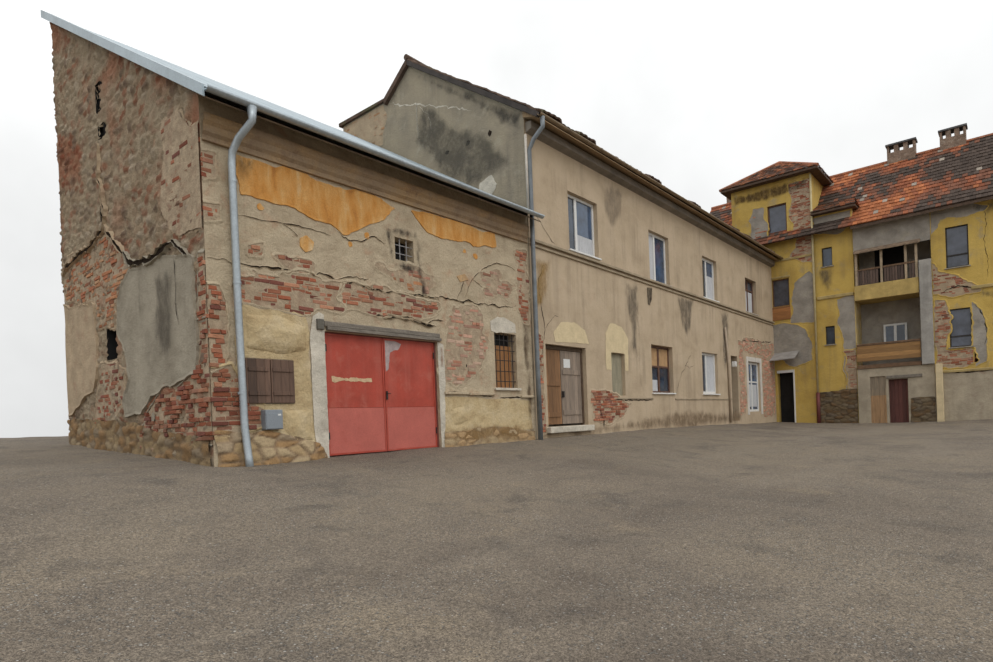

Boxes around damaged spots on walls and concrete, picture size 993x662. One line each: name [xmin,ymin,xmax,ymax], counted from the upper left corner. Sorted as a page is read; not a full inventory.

flaking render [159,108,223,238]
crack [62,143,516,328]
peeling [236,155,395,247]
flaking render [344,104,388,149]
water stain [420,111,499,182]
flaking render [62,210,548,447]
flaking render [737,177,852,419]
flaking render [836,295,858,395]
flaking render [931,263,989,370]
flaking render [589,388,632,426]